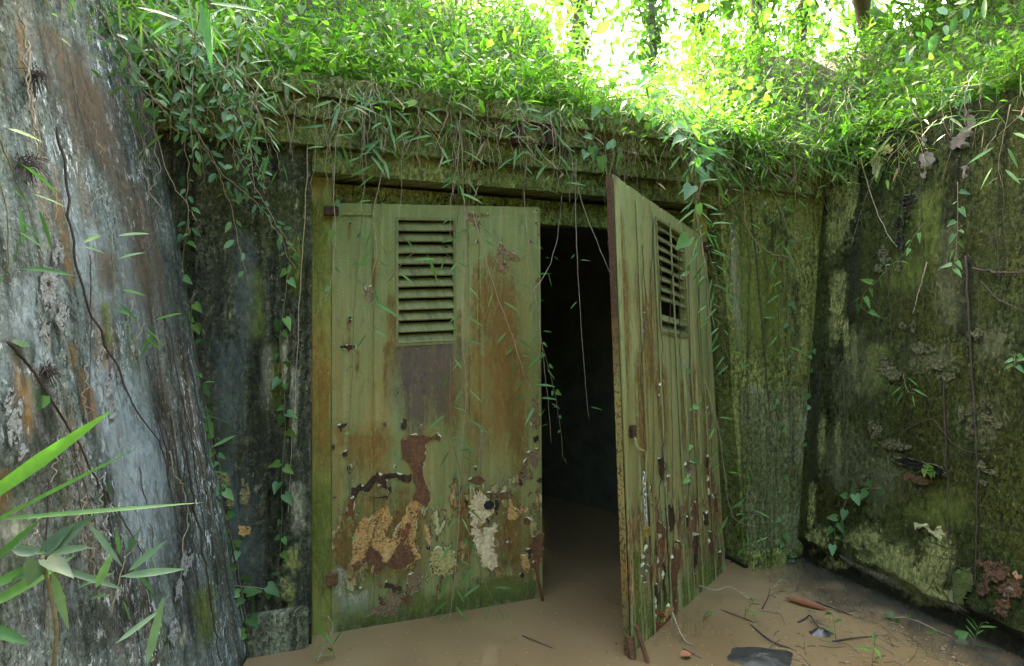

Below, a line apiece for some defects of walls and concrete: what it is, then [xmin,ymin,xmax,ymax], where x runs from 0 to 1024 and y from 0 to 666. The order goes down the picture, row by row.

damp [824,160,885,403]
damp [255,344,298,448]
peeling [518,394,542,486]
damp [795,375,911,504]
peeling [348,465,456,618]
peeling [464,490,544,579]